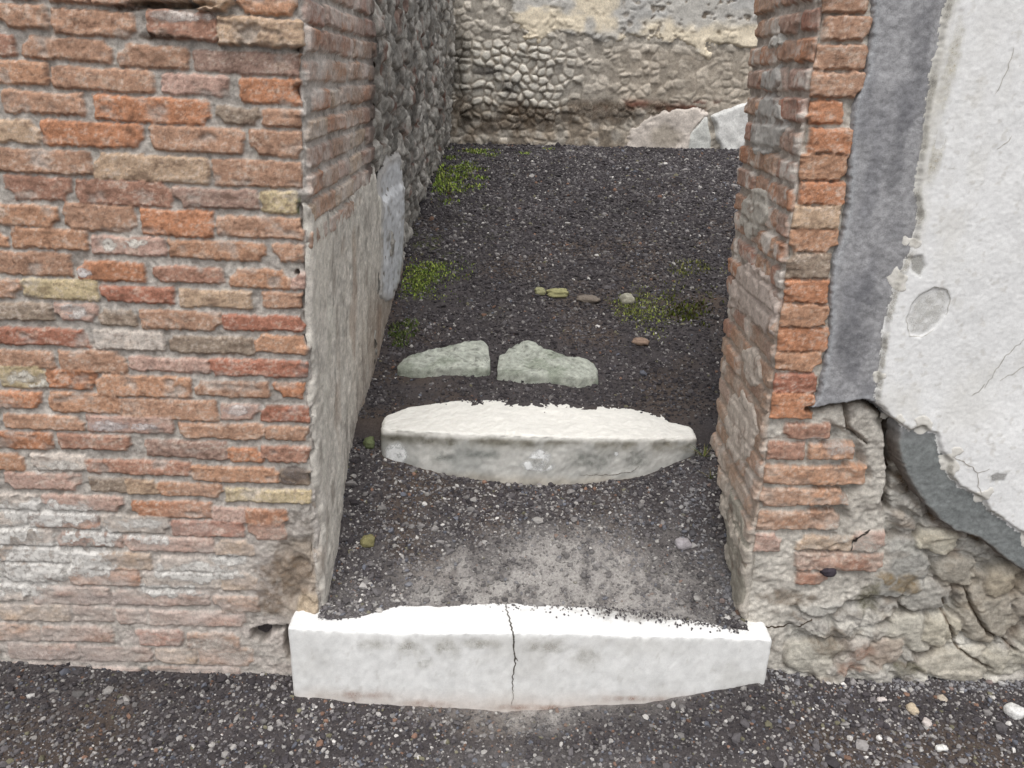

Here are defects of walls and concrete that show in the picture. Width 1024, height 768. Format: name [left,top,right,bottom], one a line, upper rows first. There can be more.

peeling [510,0,758,60]
peeling [887,236,923,319]
peeling [872,338,888,386]
crack [973,340,1023,395]
peeling [819,399,933,435]
spalling [885,455,913,495]
peeling [938,447,964,481]
peeling [973,473,1006,517]
crack [939,586,1013,666]
crack [505,603,518,705]